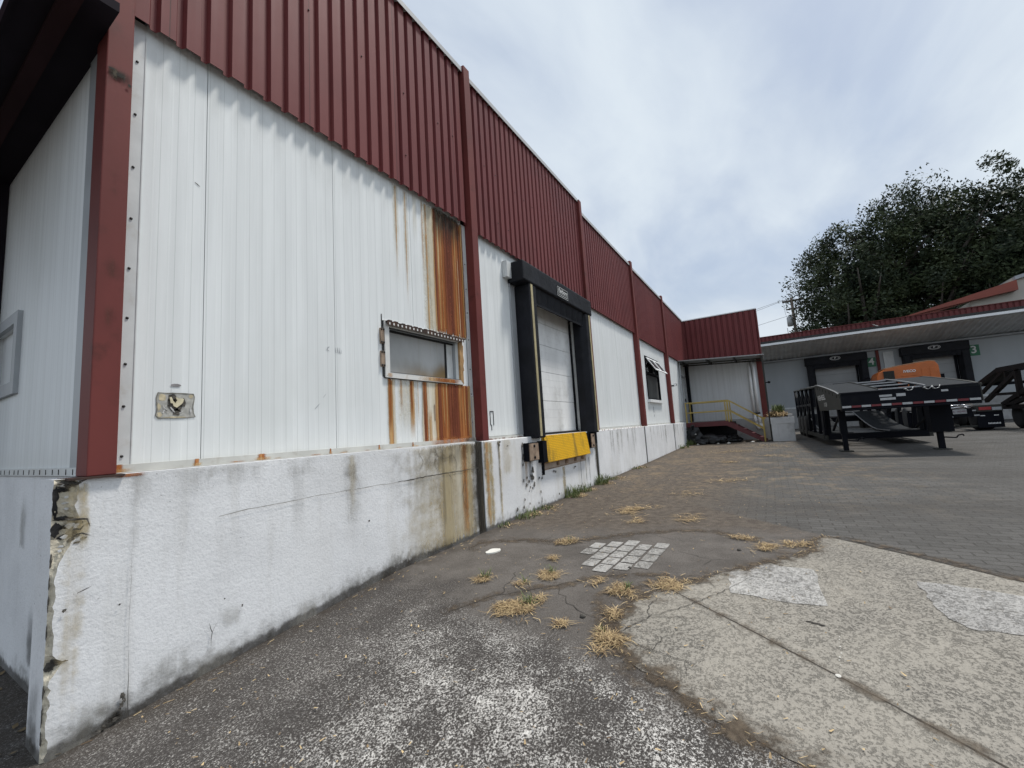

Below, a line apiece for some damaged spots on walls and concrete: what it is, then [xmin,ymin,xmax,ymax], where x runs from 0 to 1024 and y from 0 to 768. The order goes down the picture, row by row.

rust [423,204,467,338]
rust [367,373,475,451]
crack [222,447,476,516]
damp [439,442,503,549]
spalling [39,479,90,764]